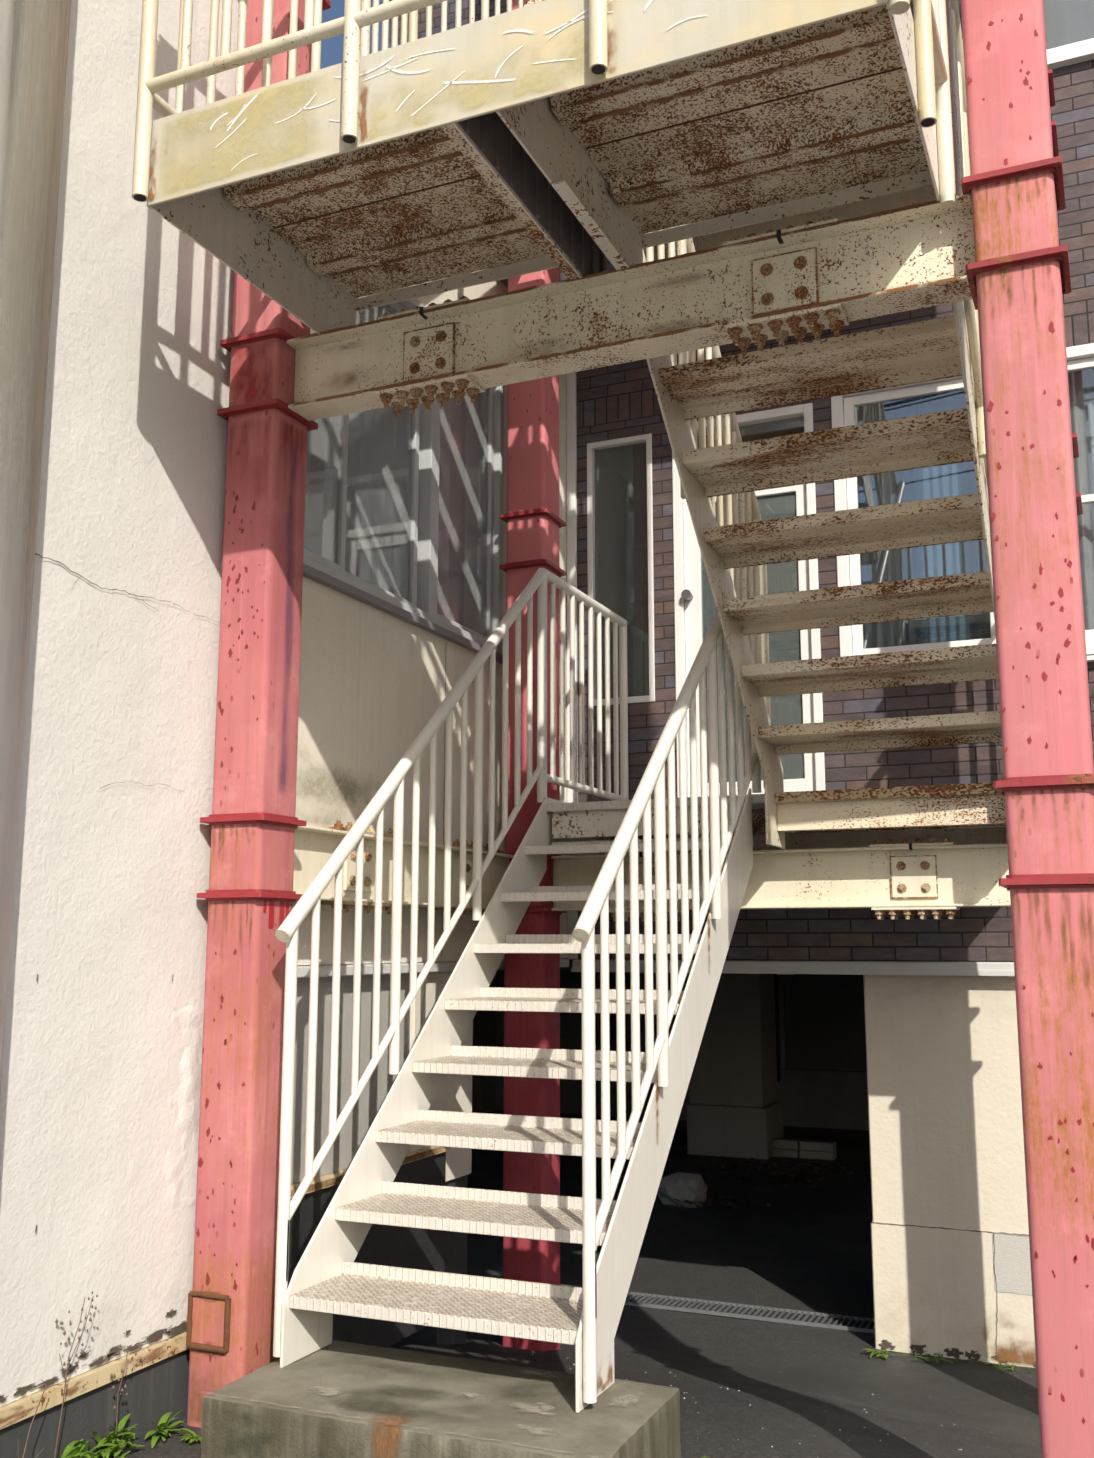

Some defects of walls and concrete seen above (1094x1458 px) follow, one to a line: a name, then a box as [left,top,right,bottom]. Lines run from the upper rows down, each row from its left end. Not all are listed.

corrosion [571,26,884,122]
corrosion [242,136,464,208]
corrosion [690,123,911,189]
corrosion [562,200,939,282]
corrosion [297,286,537,339]
corrosion [526,320,729,362]
corrosion [750,277,959,319]
corrosion [293,363,508,406]
crack [35,553,220,623]
peeling [0,1309,187,1403]
damp [314,1386,435,1414]
damp [517,1403,553,1434]